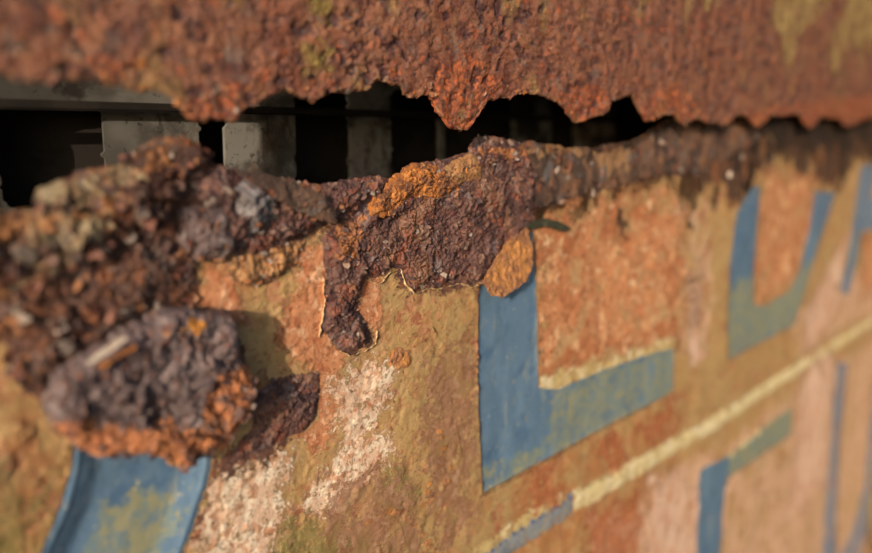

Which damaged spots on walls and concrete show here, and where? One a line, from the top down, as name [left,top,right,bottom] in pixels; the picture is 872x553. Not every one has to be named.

corrosion [0,116,759,549]
leakage [525,119,871,237]